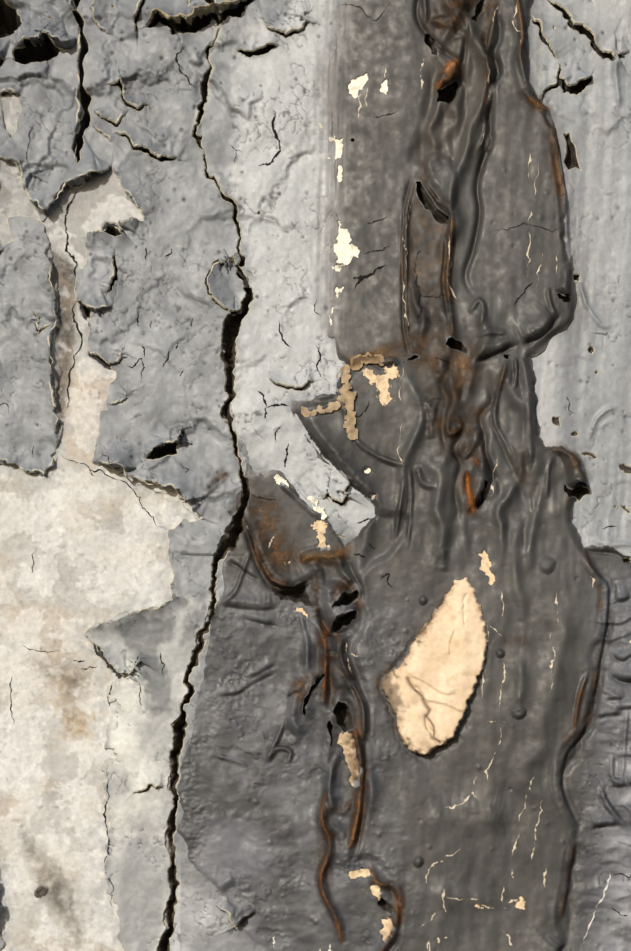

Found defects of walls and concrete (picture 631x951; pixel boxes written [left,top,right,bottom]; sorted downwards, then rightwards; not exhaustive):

peeling [530,0,631,102]
corrosion [526,95,564,198]
crack [64,191,83,409]
peeling [268,352,400,440]
crack [62,454,159,527]
peeling [0,0,323,951]
crack [128,0,289,951]
corrosion [464,472,475,513]
corrosion [314,580,364,848]
spalling [382,578,488,755]
crack [103,780,114,906]
corrosion [371,870,402,951]